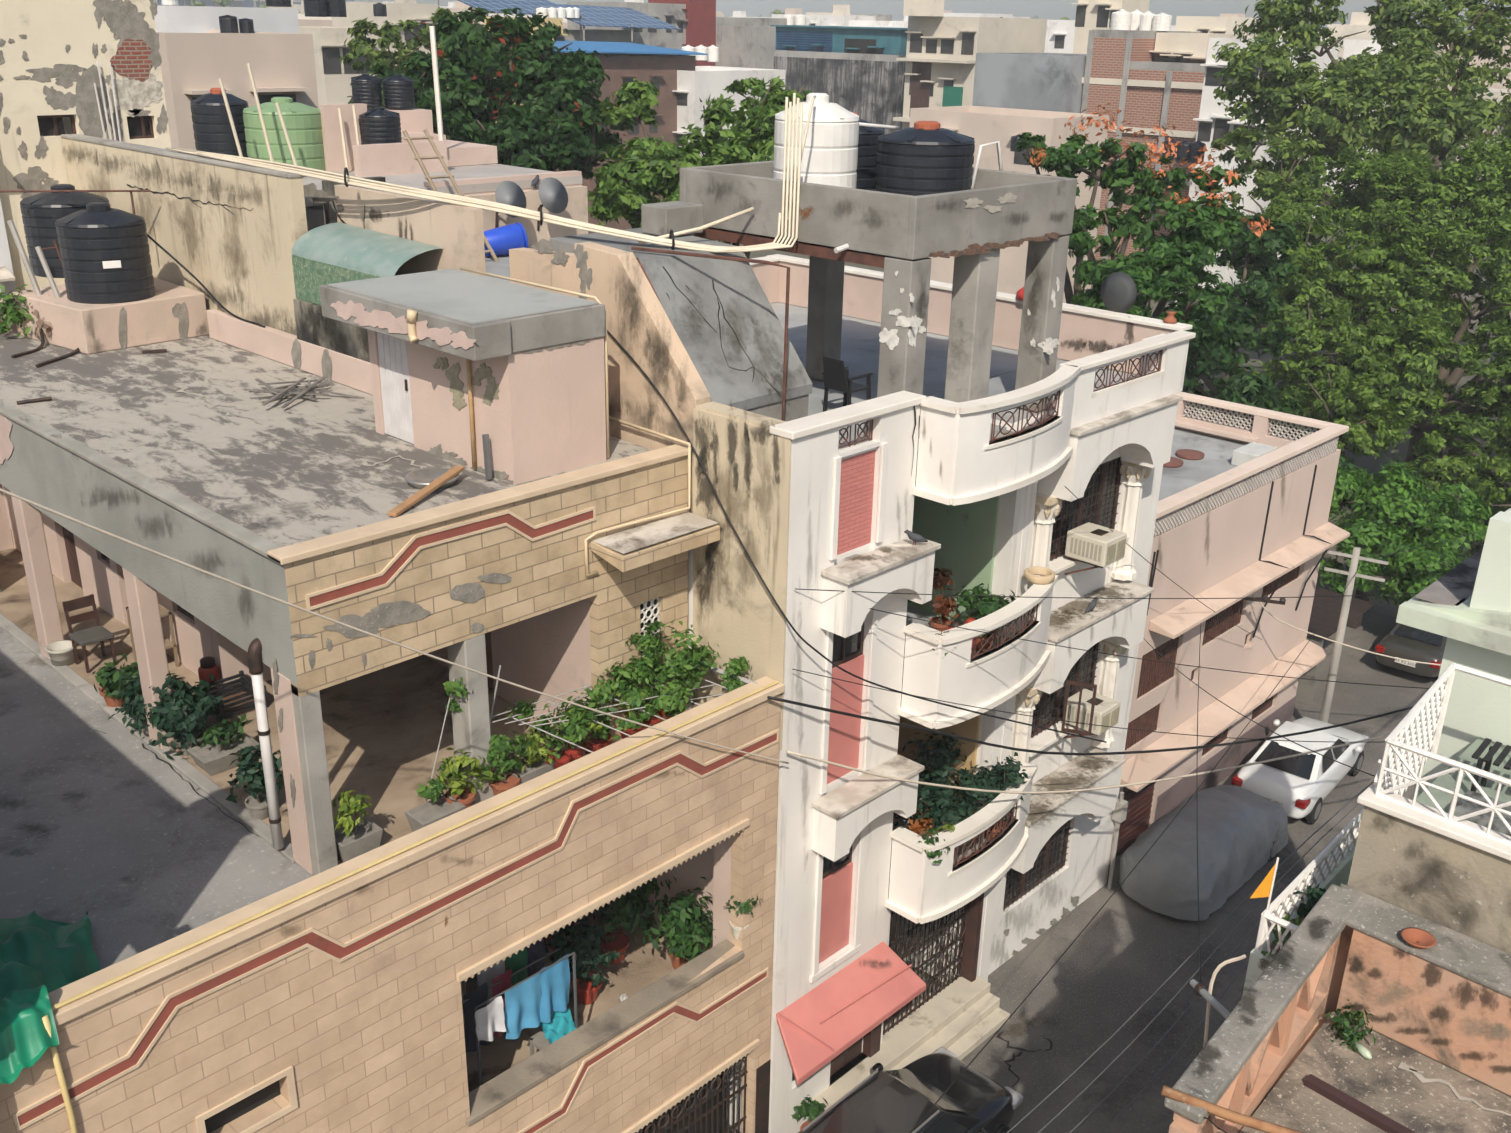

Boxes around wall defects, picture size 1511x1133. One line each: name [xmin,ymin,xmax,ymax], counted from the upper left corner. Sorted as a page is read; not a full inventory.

flaking render [0,0,169,199]
peeling [330,300,499,410]
crack [662,266,790,405]
peeling [879,271,926,350]
peeling [0,414,14,464]
leakage [696,406,779,510]
peeling [323,600,431,638]
peeling [449,573,512,603]
leakage [697,528,722,605]
leakage [1350,959,1381,978]
leakage [1423,964,1441,986]
leakage [1350,983,1511,1073]